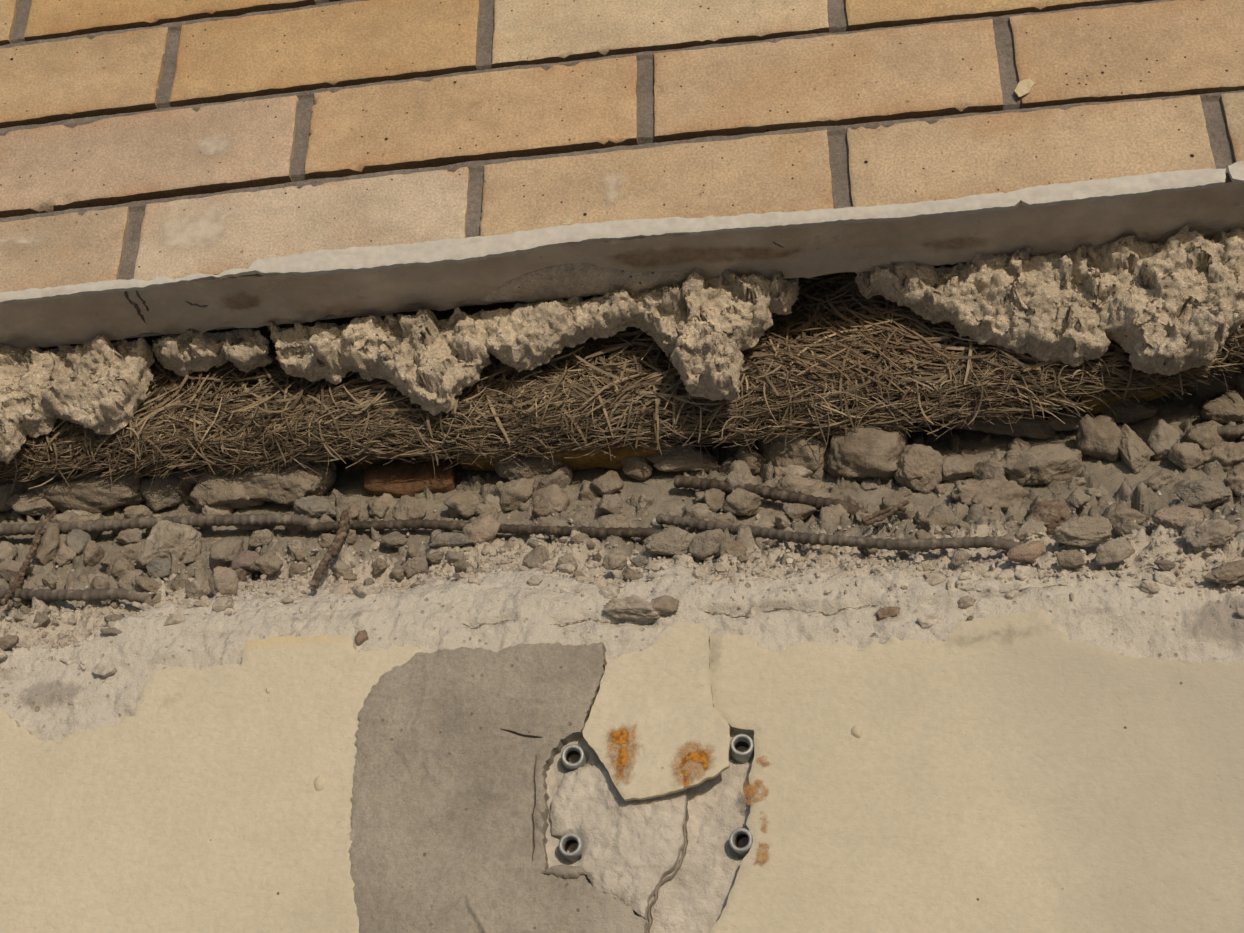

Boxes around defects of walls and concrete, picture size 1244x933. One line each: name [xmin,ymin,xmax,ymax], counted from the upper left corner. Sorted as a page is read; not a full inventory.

crack [124,290,149,324]
spalling [0,397,1244,933]
crack [583,665,605,729]
rust [609,729,635,778]
rust [675,743,711,786]
rust [742,780,768,804]
crack [647,801,689,933]
rust [757,824,769,865]